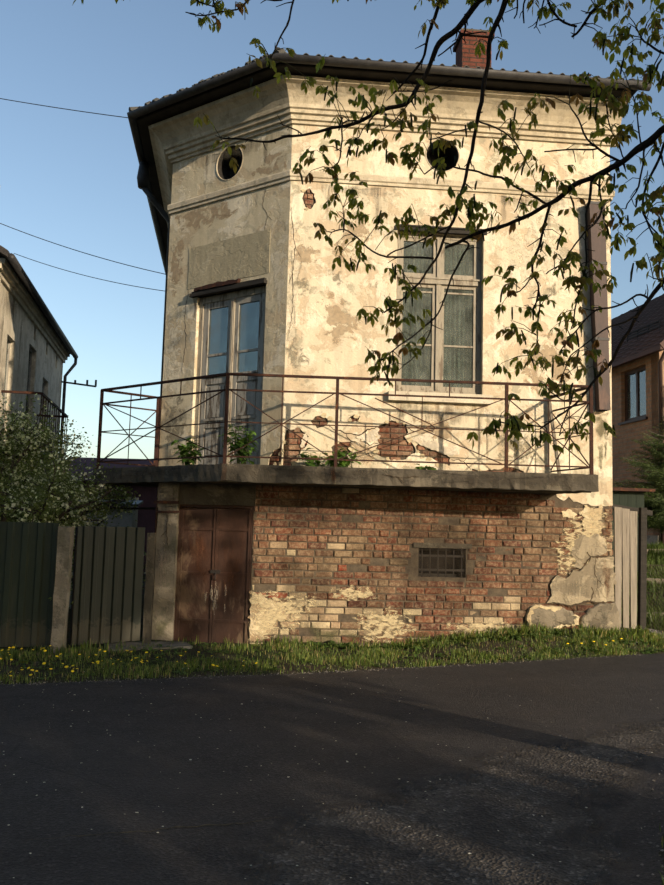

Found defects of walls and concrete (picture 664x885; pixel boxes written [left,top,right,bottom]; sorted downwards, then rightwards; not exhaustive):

spalling [311,413,334,428]
spalling [269,428,310,466]
spalling [331,420,461,468]